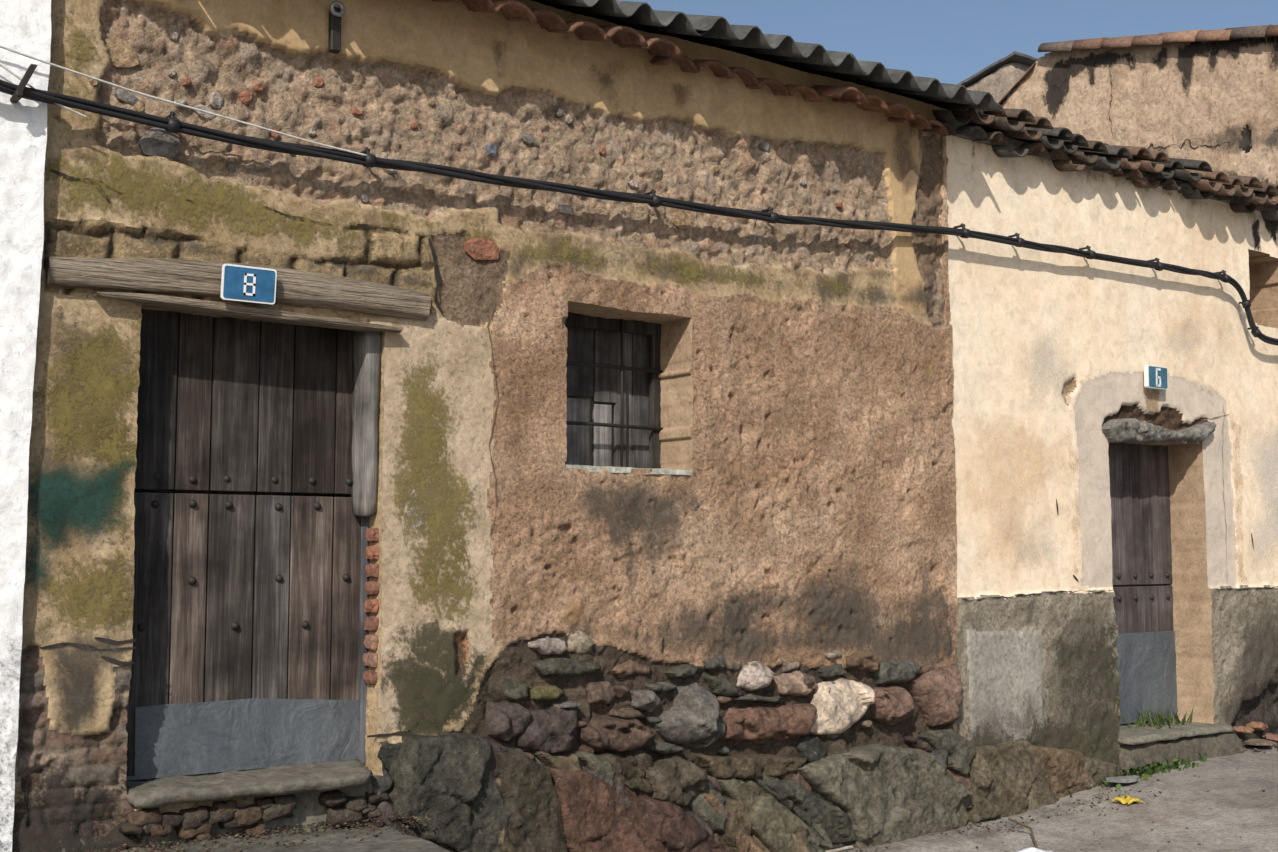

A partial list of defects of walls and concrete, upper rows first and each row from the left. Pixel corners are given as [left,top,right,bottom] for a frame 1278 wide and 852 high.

flaking render [88,0,894,274]
leakage [1043,51,1135,118]
leakage [1153,36,1278,90]
flaking render [43,218,510,327]
flaking render [912,119,951,330]
flaking render [1102,390,1216,444]
leakage [588,481,695,599]
flaking render [0,645,138,839]
leakage [379,619,498,736]
flaking render [485,631,964,760]
leakage [648,568,953,669]
leakage [1226,605,1278,747]